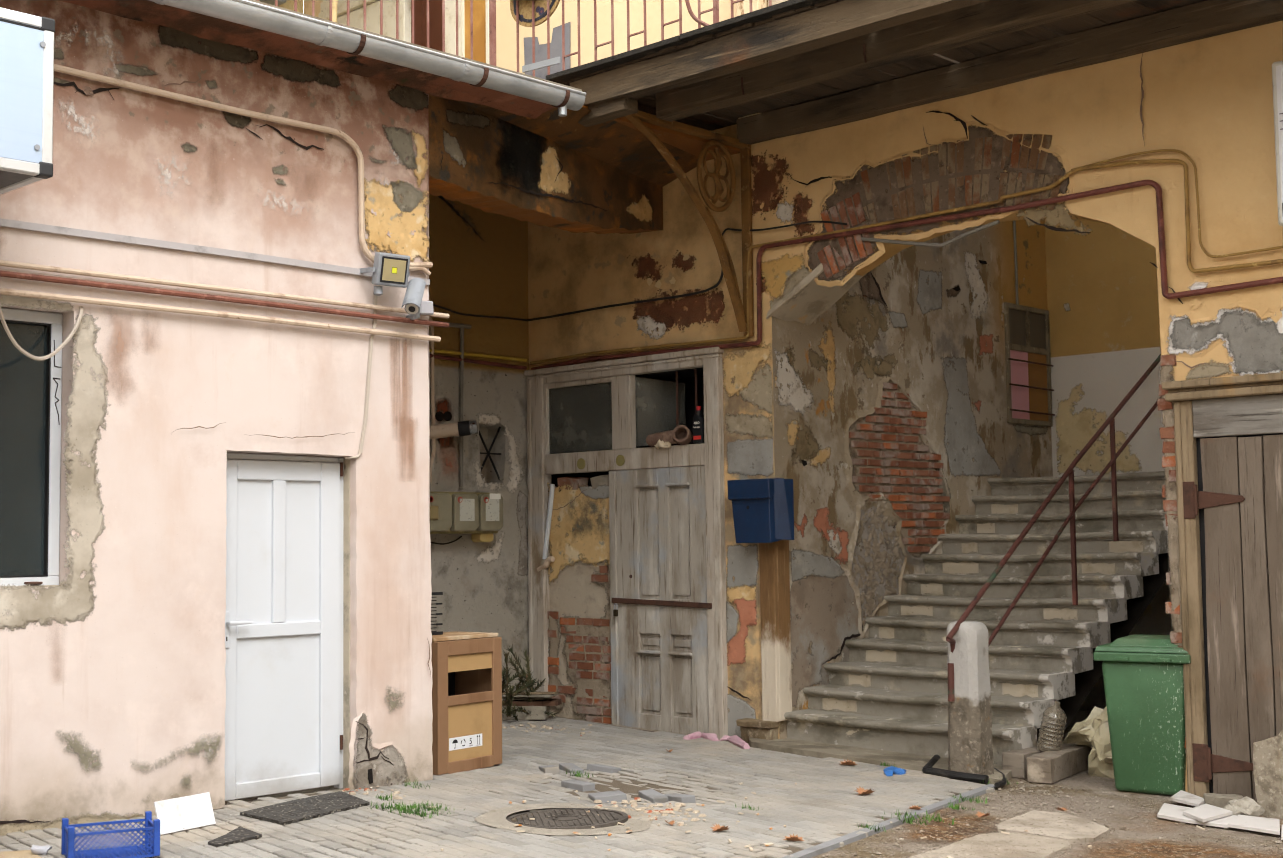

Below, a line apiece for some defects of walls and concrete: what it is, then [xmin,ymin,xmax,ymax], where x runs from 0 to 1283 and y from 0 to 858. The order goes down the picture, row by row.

crack [54,82,119,100]
flaking render [158,25,341,88]
crack [246,124,324,150]
peeling [364,125,467,274]
peeling [538,146,571,195]
peeling [627,250,726,339]
flaking render [723,121,1092,639]
peeling [1157,282,1283,647]
flaking render [547,482,612,724]
water stain [58,732,101,771]
water stain [132,736,221,769]
flaking render [348,711,410,790]